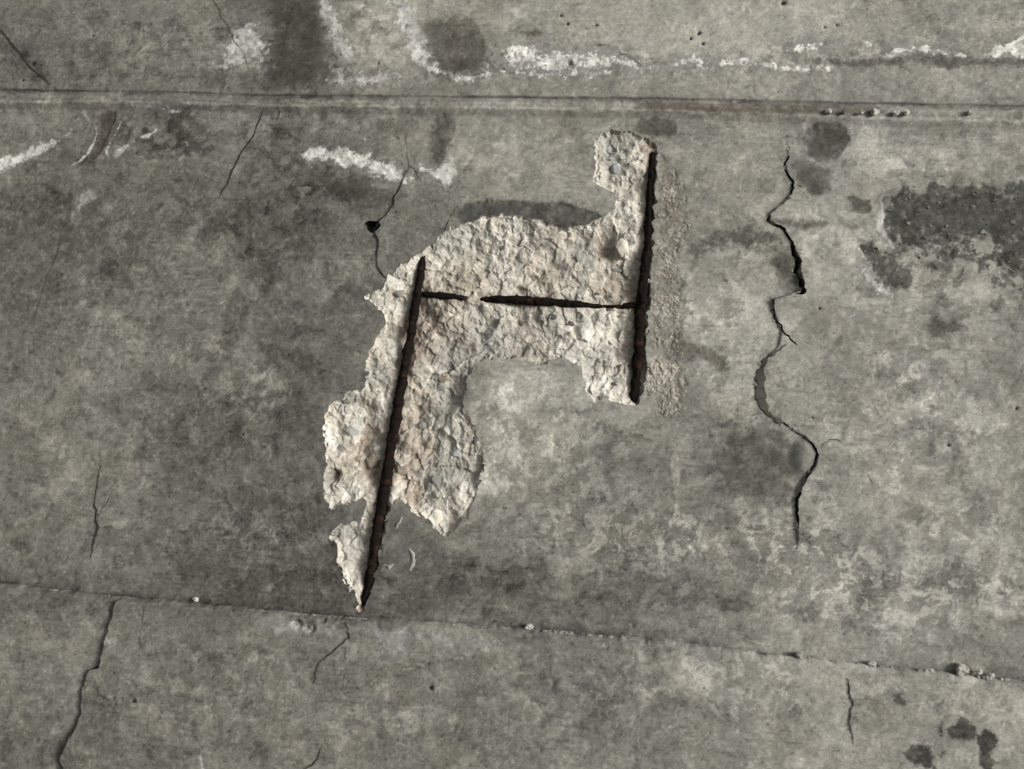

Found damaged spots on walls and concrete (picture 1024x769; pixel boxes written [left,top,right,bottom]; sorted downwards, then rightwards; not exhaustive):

leakage [392,0,966,82]
leakage [983,29,1024,64]
crack [224,109,280,189]
leakage [302,120,456,186]
leakage [792,123,848,194]
crack [364,133,420,280]
leakage [860,181,1024,289]
spalling [322,129,693,613]
corrosion [361,151,656,608]
crack [754,134,844,549]
leakage [906,745,935,769]
leakage [940,717,998,769]